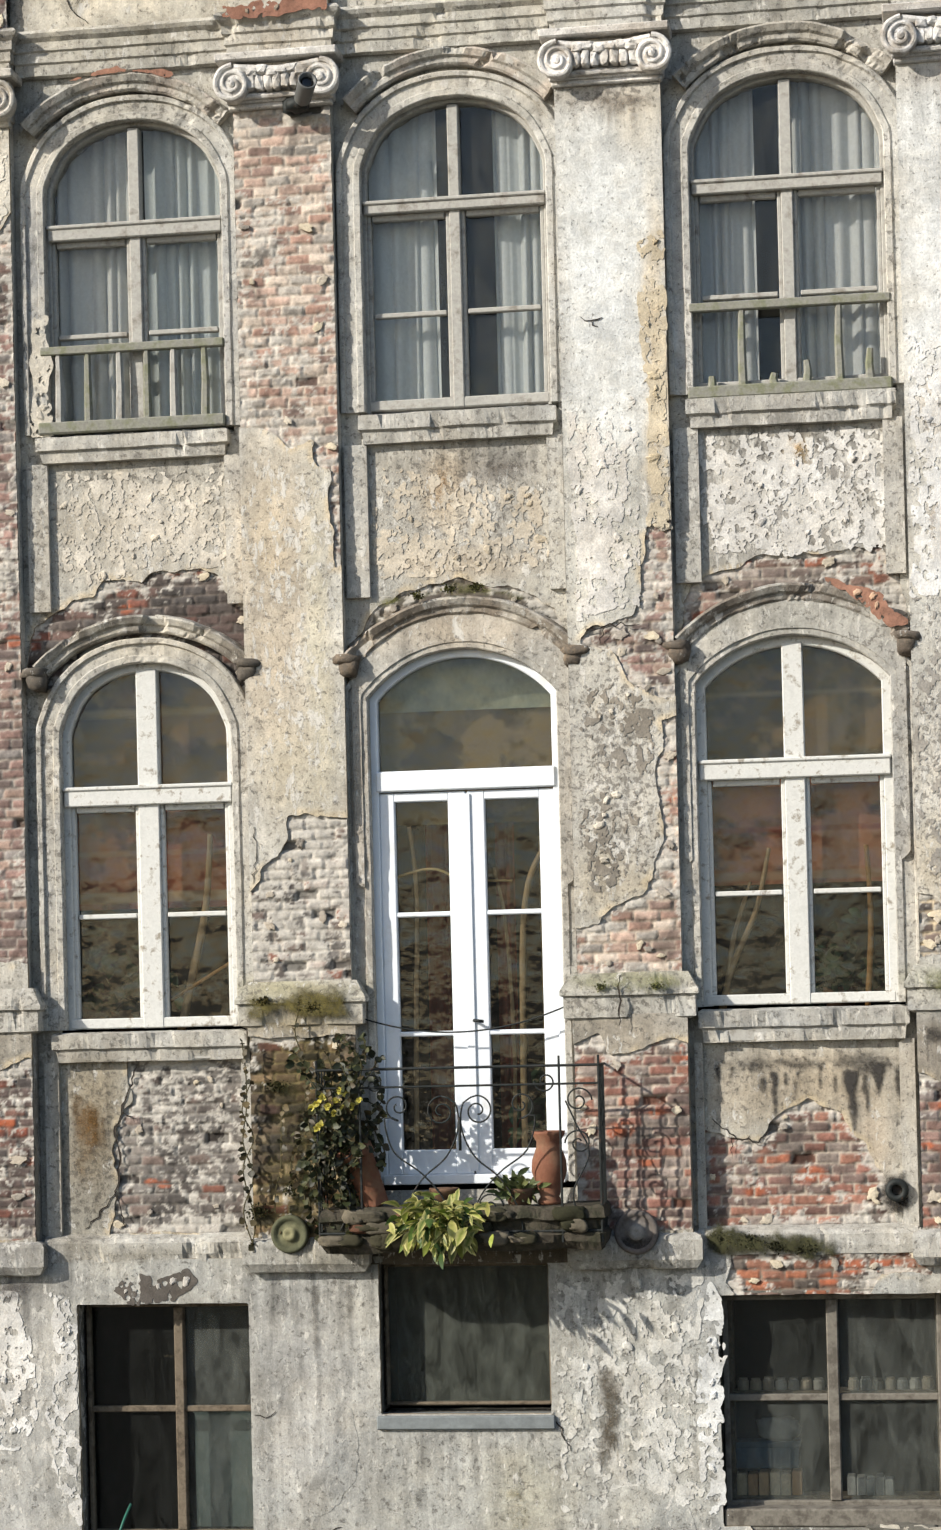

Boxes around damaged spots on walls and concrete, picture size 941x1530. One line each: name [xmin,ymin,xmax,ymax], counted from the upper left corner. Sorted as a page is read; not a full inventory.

flaking render [233,105,341,567]
flaking render [0,129,245,964]
peeling [347,230,941,974]
flaking render [251,813,351,982]
flaking render [0,1057,36,1241]
crack [86,1067,137,1229]
flaking render [110,1034,357,1239]
flaking render [574,1033,898,1233]
damp [716,1057,900,1131]
flaking render [919,1073,941,1229]
peeling [0,1290,83,1526]